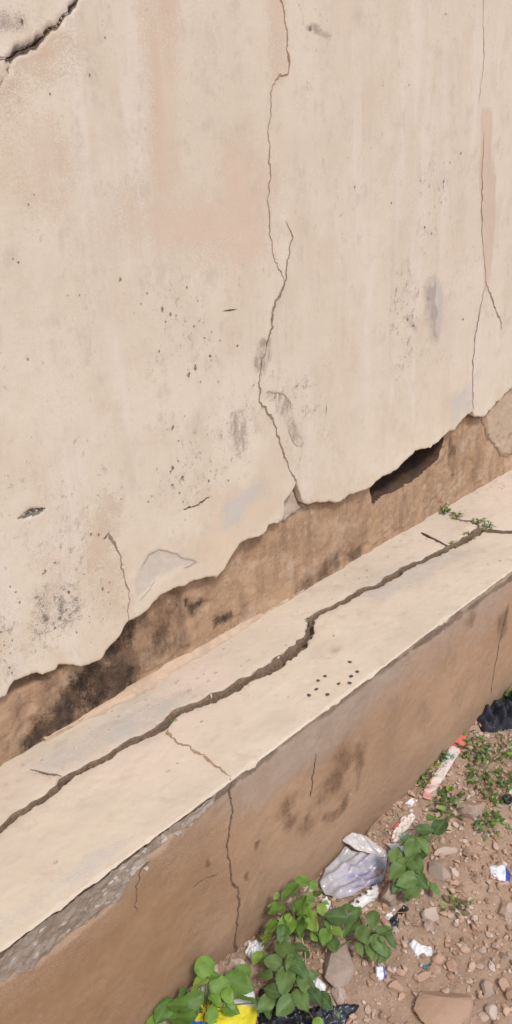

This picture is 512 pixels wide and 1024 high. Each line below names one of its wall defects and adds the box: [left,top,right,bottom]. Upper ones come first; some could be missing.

crack [0,0,78,85]
crack [258,0,297,482]
crack [472,132,512,457]
spalling [0,794,216,981]
water stain [14,490,206,782]
flaking render [0,389,512,767]
crack [0,518,512,952]